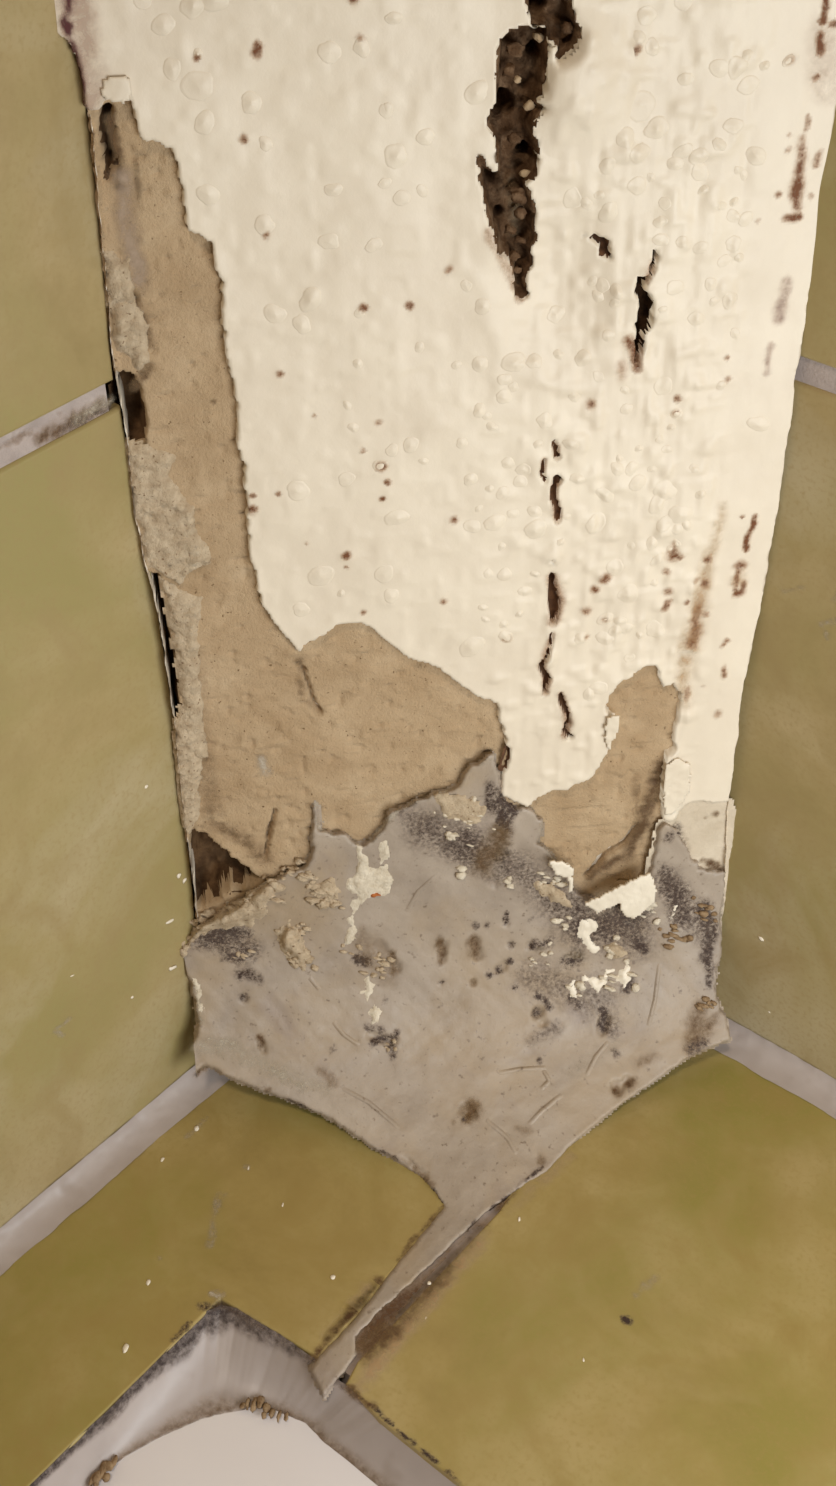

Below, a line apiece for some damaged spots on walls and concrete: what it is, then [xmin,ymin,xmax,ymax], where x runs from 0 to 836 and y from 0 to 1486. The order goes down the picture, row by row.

crack [476,0,582,298]
crack [589,234,658,372]
peeling [87,76,736,921]
crack [540,439,561,521]
rust [734,515,757,596]
crack [538,572,573,738]
leakage [195,926,262,1000]
peeling [275,919,311,971]
leakage [344,782,650,1058]
peeling [568,941,631,998]
leakage [658,866,718,987]
leakage [686,1010,713,1052]